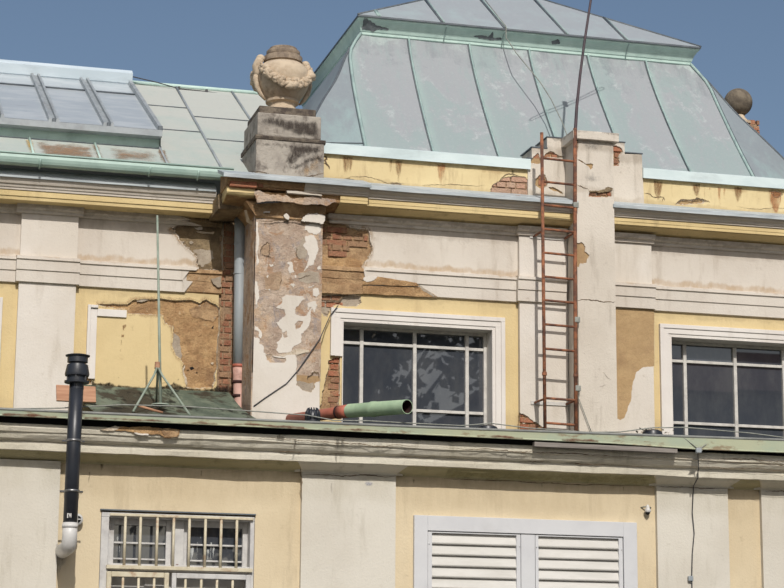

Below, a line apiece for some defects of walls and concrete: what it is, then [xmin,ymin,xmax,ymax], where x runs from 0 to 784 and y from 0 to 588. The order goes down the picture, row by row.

water stain [266,118,317,135]
water stain [288,146,320,171]
spalling [531,151,564,164]
spalling [613,145,623,166]
spalling [490,173,563,195]
spalling [588,187,613,197]
spalling [577,242,589,267]
spalling [97,221,234,396]
peeling [252,211,373,420]
peeling [616,308,655,420]